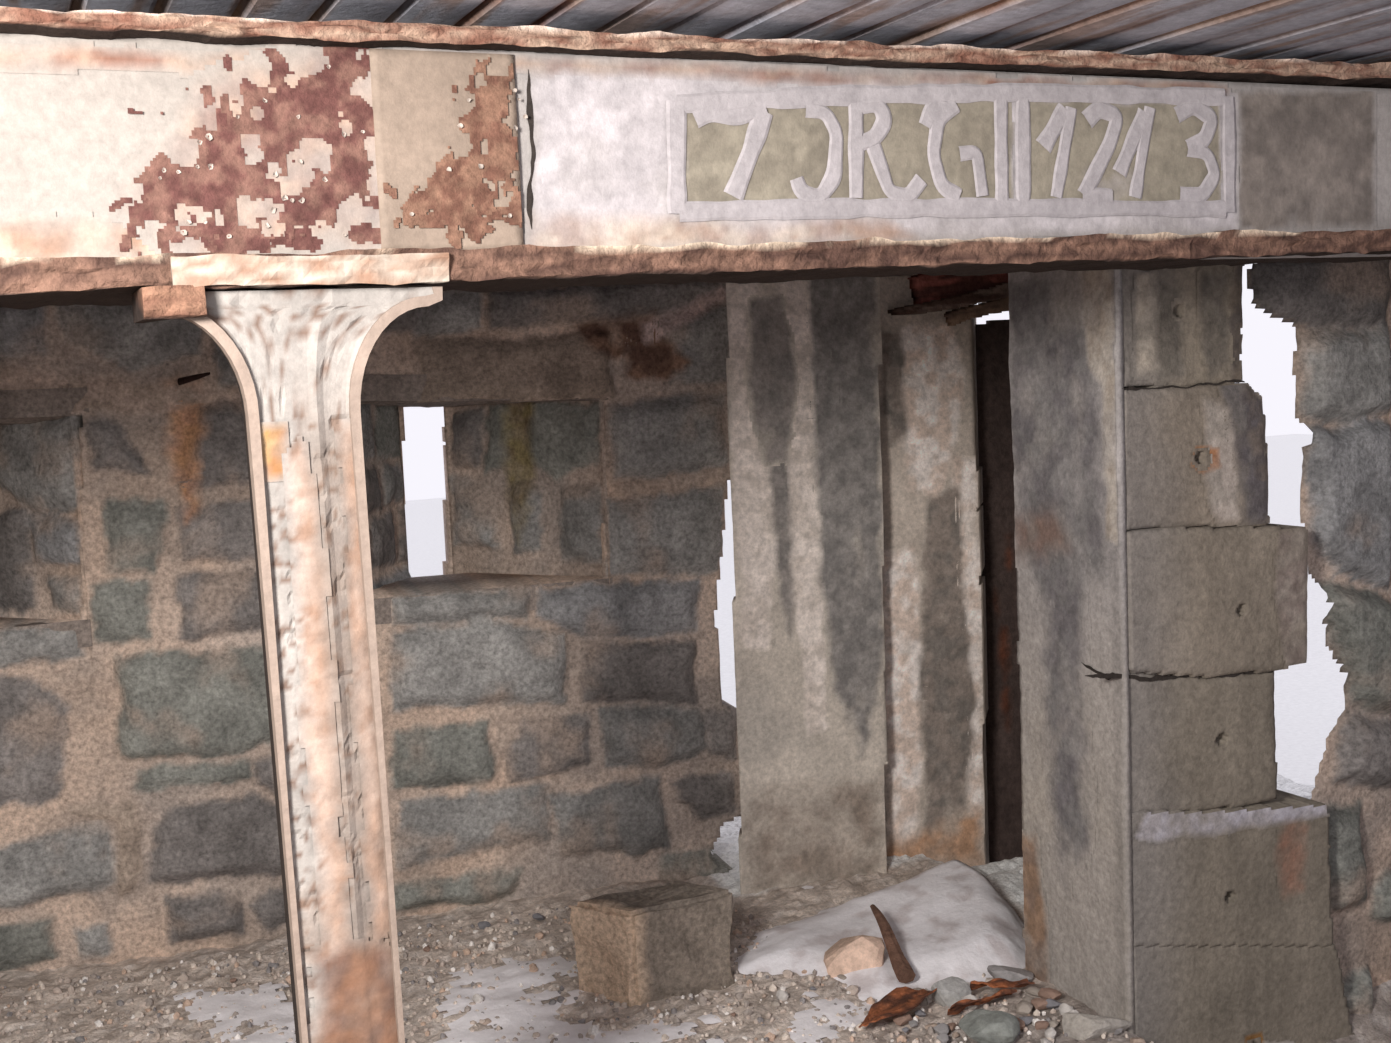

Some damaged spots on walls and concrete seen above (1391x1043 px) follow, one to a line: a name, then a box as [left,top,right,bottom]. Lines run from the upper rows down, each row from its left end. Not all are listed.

peeling [109,47,528,256]
crack [526,69,536,229]
corrosion [260,418,398,1043]
damp [637,277,985,894]